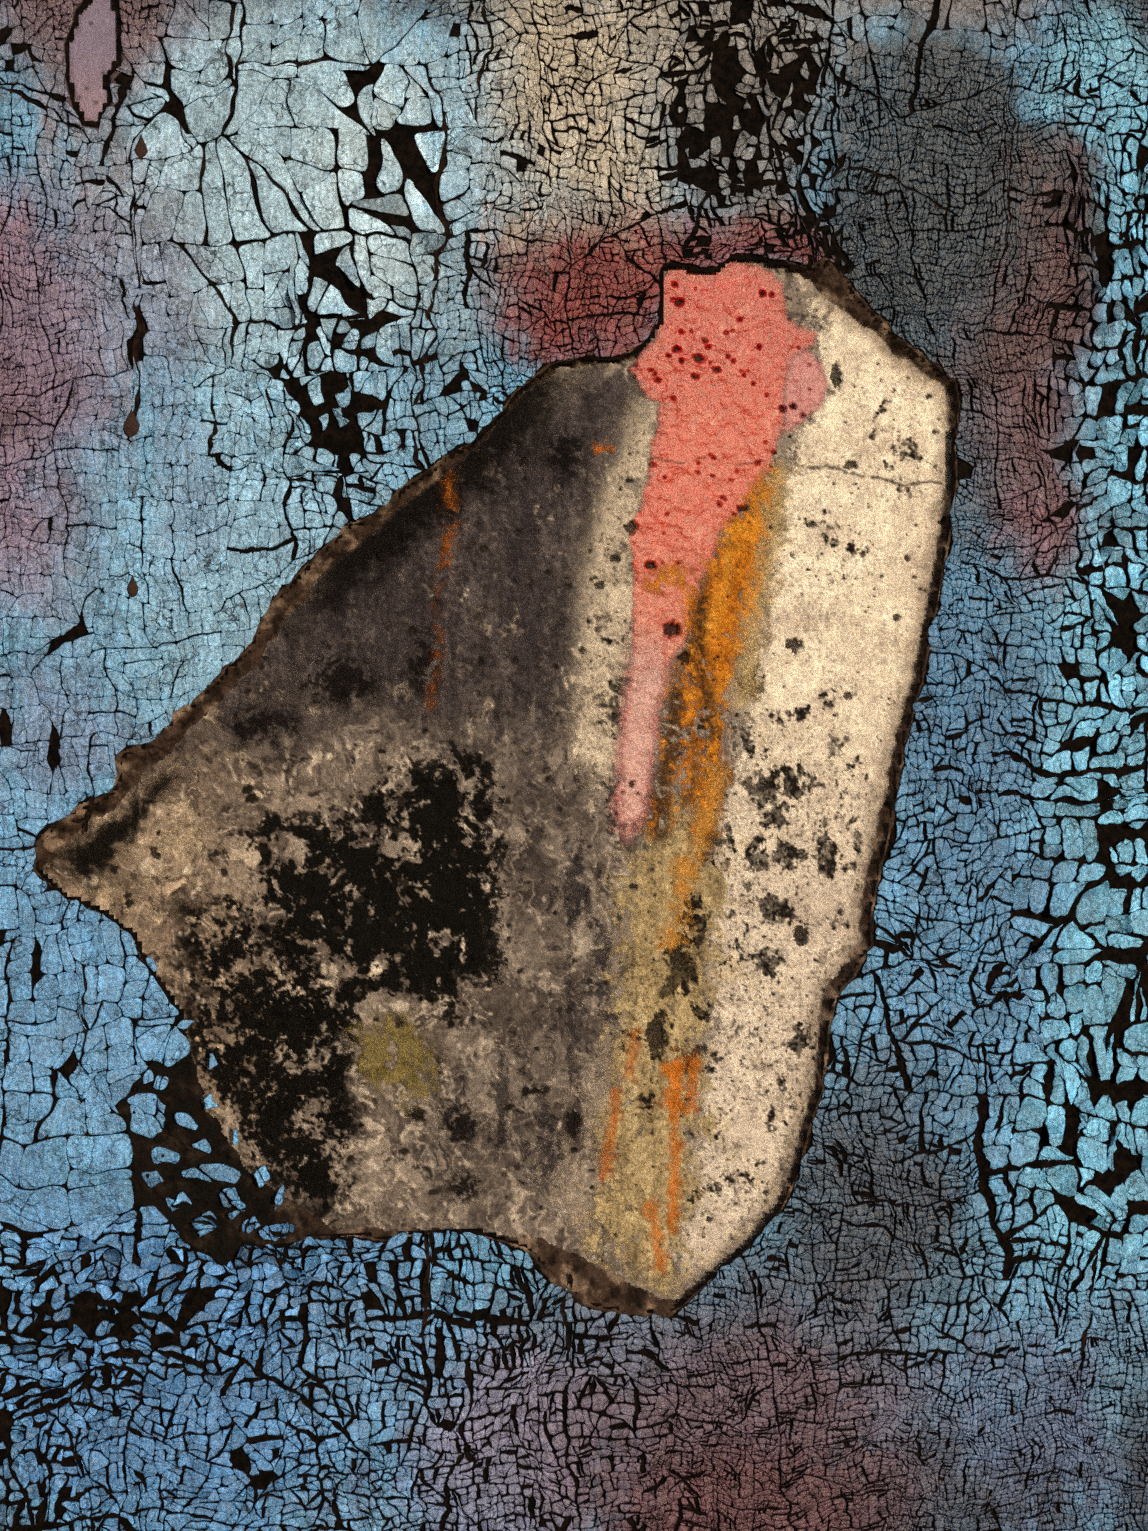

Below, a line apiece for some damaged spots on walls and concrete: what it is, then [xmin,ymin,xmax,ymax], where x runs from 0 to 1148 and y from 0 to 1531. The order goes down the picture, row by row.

peeling [0,0,127,158]
crack [225,8,329,73]
crack [131,206,150,416]
crack [205,277,239,445]
crack [187,130,290,216]
crack [412,0,496,466]
spalling [32,0,1017,1374]
peeling [1008,159,1148,1251]
crack [65,972,103,1043]
rust [645,1058,700,1271]
crack [416,1231,432,1351]
crack [1076,1261,1097,1353]